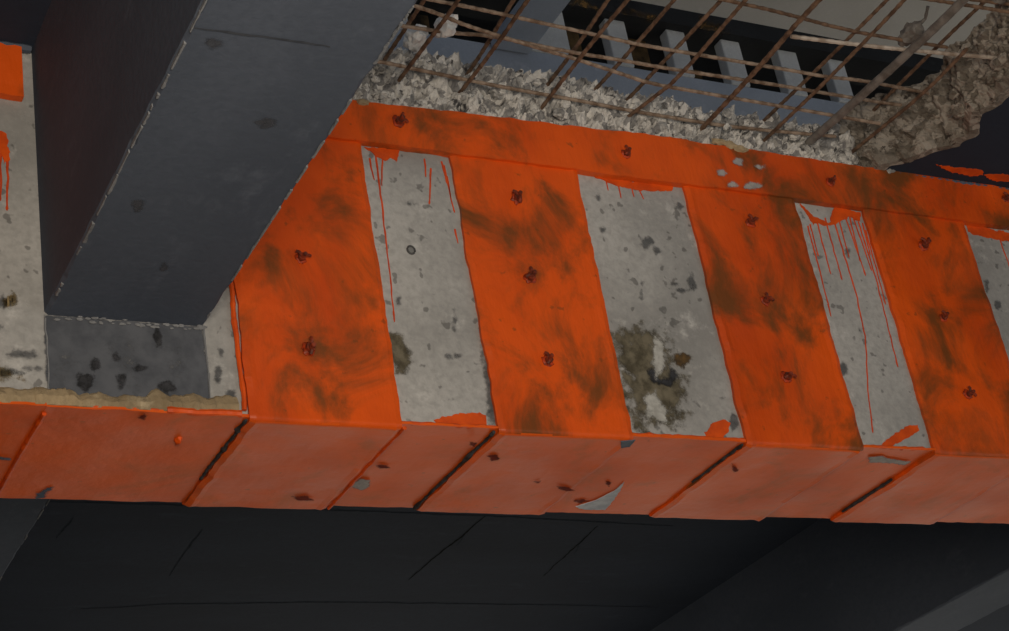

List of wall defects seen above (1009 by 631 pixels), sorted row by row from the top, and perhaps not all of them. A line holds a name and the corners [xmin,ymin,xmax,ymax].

spalling [352,0,1009,173]
peeling [717,169,762,189]
leakage [674,353,691,368]
peeling [869,456,910,465]
peeling [576,482,624,510]